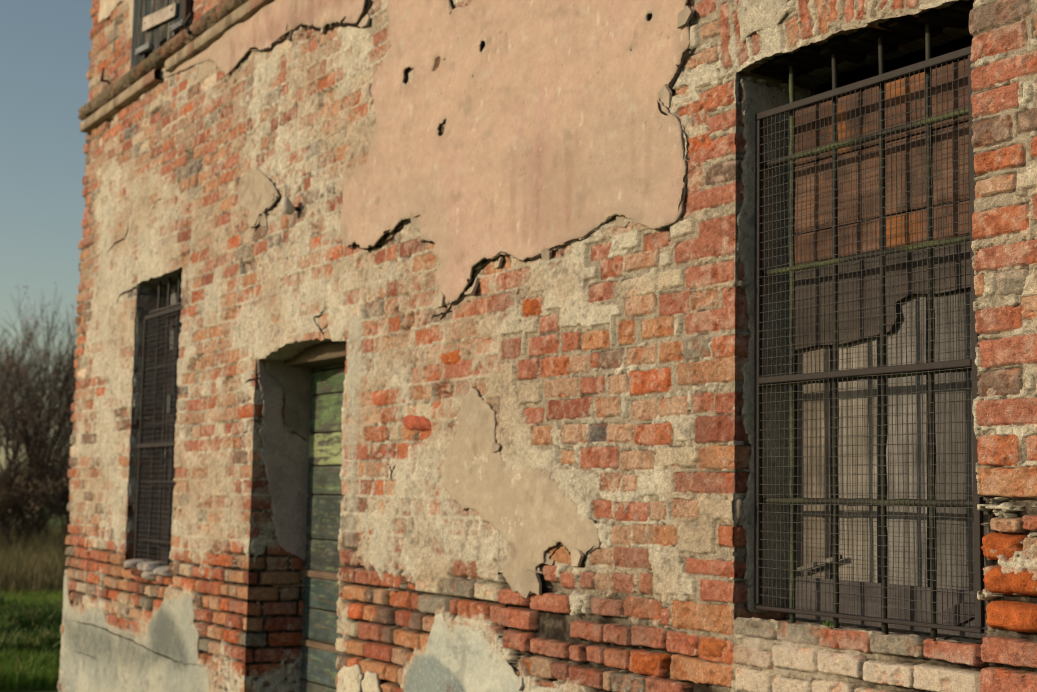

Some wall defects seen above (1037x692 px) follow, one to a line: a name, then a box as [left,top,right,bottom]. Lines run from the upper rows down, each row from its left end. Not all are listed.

peeling [98,0,134,37]
peeling [165,0,371,78]
peeling [737,0,789,43]
peeling [340,0,694,309]
peeling [257,360,314,560]
spalling [402,415,431,431]
peeling [441,386,601,599]
spalling [981,532,1037,633]
peeling [58,575,210,692]
crack [72,620,208,667]
peeling [337,664,383,692]
peeling [406,612,575,692]